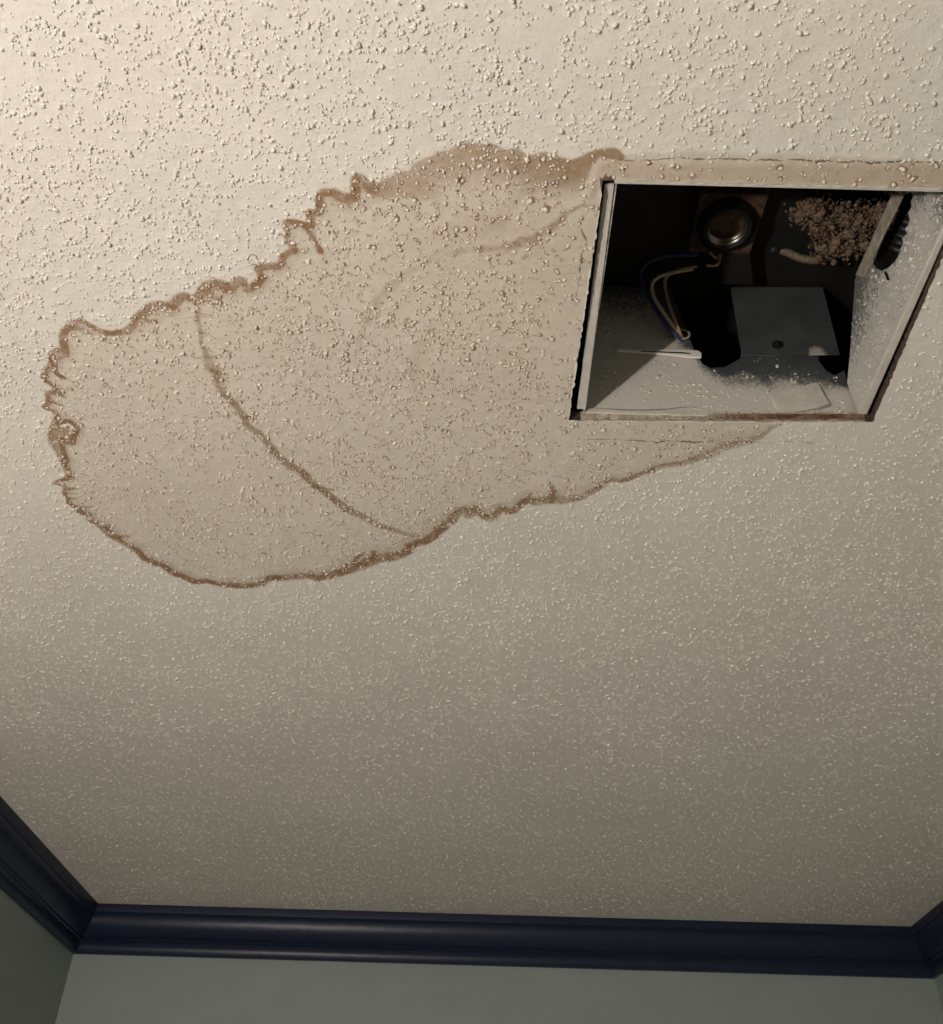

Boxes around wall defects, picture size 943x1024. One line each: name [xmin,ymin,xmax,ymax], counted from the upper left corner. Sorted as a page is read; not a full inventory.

damp [41,143,780,589]
damp [852,162,941,188]